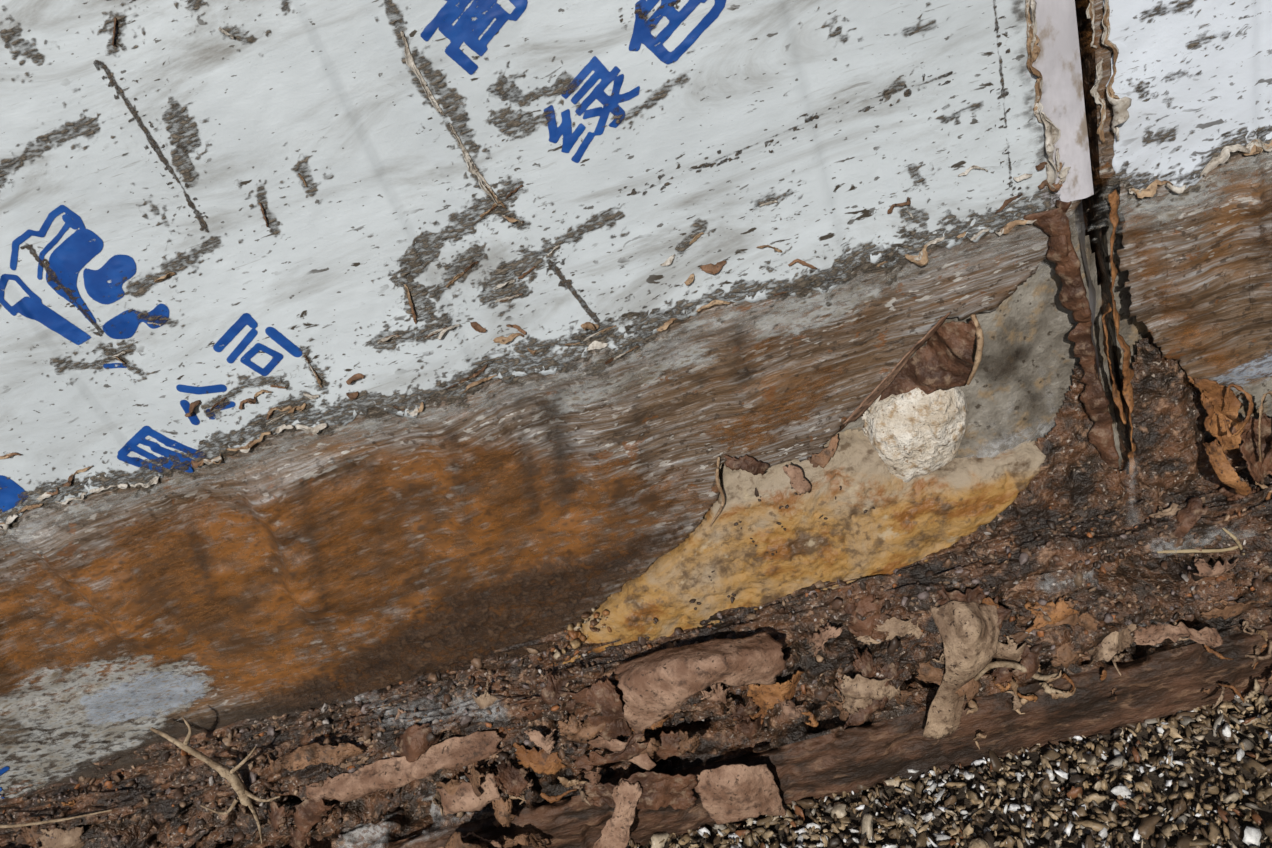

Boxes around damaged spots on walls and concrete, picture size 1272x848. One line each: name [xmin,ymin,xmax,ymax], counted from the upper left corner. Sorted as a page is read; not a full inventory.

peeling [0,0,1071,554]
peeling [1086,0,1132,144]
peeling [1108,126,1272,231]
spalling [538,209,1122,667]
rust [0,444,695,721]
rust [267,632,819,848]
rust [807,594,1272,739]
rust [1193,556,1239,577]